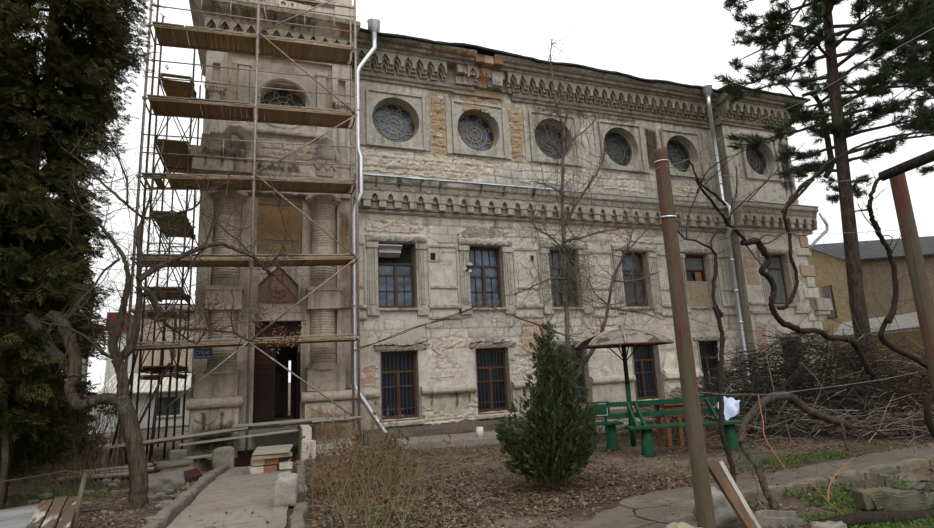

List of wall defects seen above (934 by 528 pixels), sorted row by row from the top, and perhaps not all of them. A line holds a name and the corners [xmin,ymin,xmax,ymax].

flaking render [361,96,486,181]
flaking render [457,95,571,185]